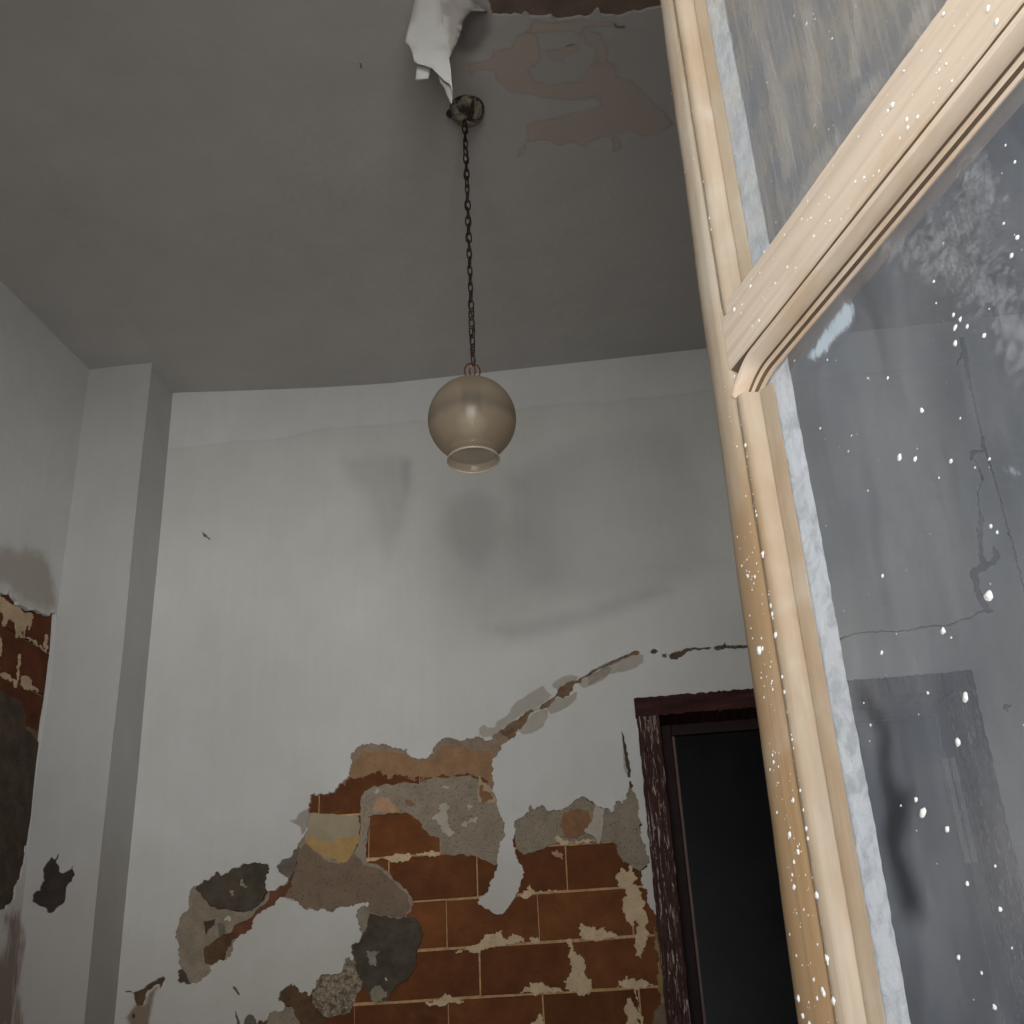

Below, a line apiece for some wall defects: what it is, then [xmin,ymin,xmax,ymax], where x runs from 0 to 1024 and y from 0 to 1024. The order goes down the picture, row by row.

peeling [405,0,661,104]
spalling [0,594,52,910]
spalling [33,855,75,913]
spalling [175,732,667,1024]
spalling [127,977,165,1024]